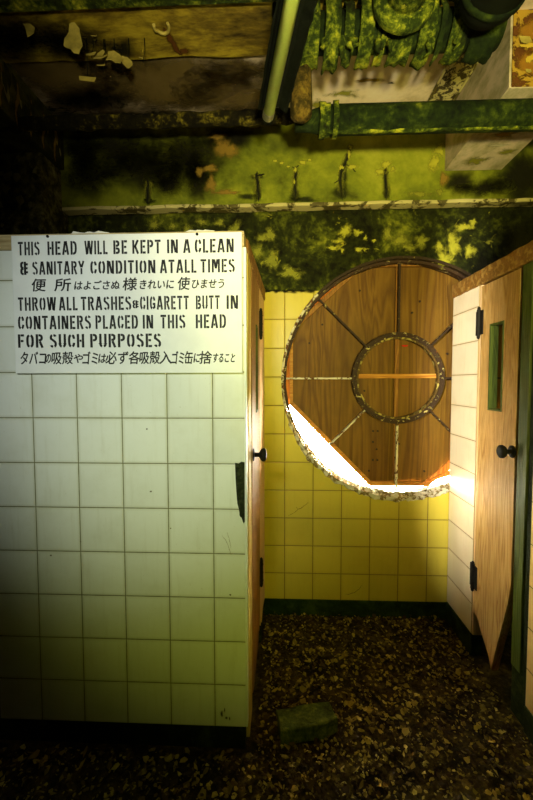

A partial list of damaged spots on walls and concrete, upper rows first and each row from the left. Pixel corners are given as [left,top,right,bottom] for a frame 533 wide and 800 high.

peeling [64,22,145,82]
rust [152,21,189,55]
leakage [10,56,265,115]
leakage [64,128,251,196]
leakage [446,132,533,208]
leakage [475,223,533,271]
spalling [235,462,245,523]